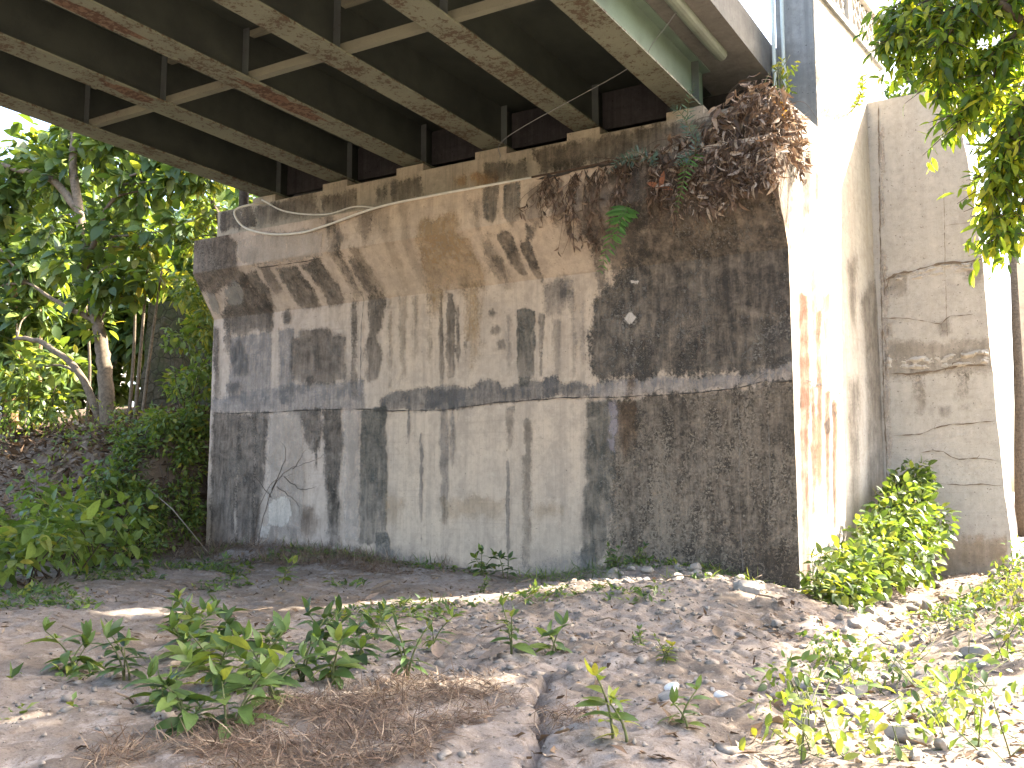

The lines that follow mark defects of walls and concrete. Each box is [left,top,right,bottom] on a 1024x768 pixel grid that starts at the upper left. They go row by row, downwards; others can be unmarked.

water stain [209,158,793,572]
crack [230,295,842,568]
water stain [702,544,800,589]
corrosion [800,291,837,577]
crack [878,107,1003,507]